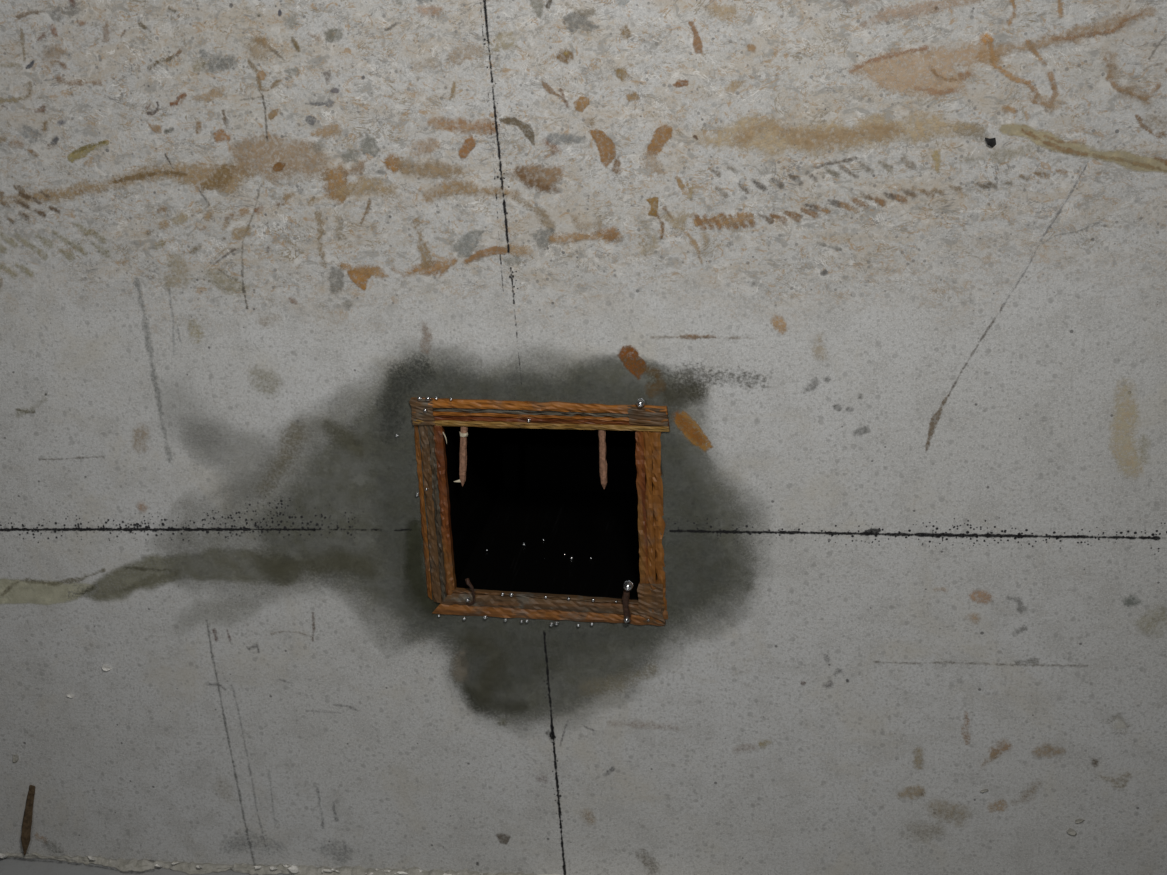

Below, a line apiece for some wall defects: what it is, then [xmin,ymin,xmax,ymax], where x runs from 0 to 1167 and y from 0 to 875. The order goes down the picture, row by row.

corrosion [619,346,662,394]
corrosion [675,411,712,451]
water stain [0,359,758,715]